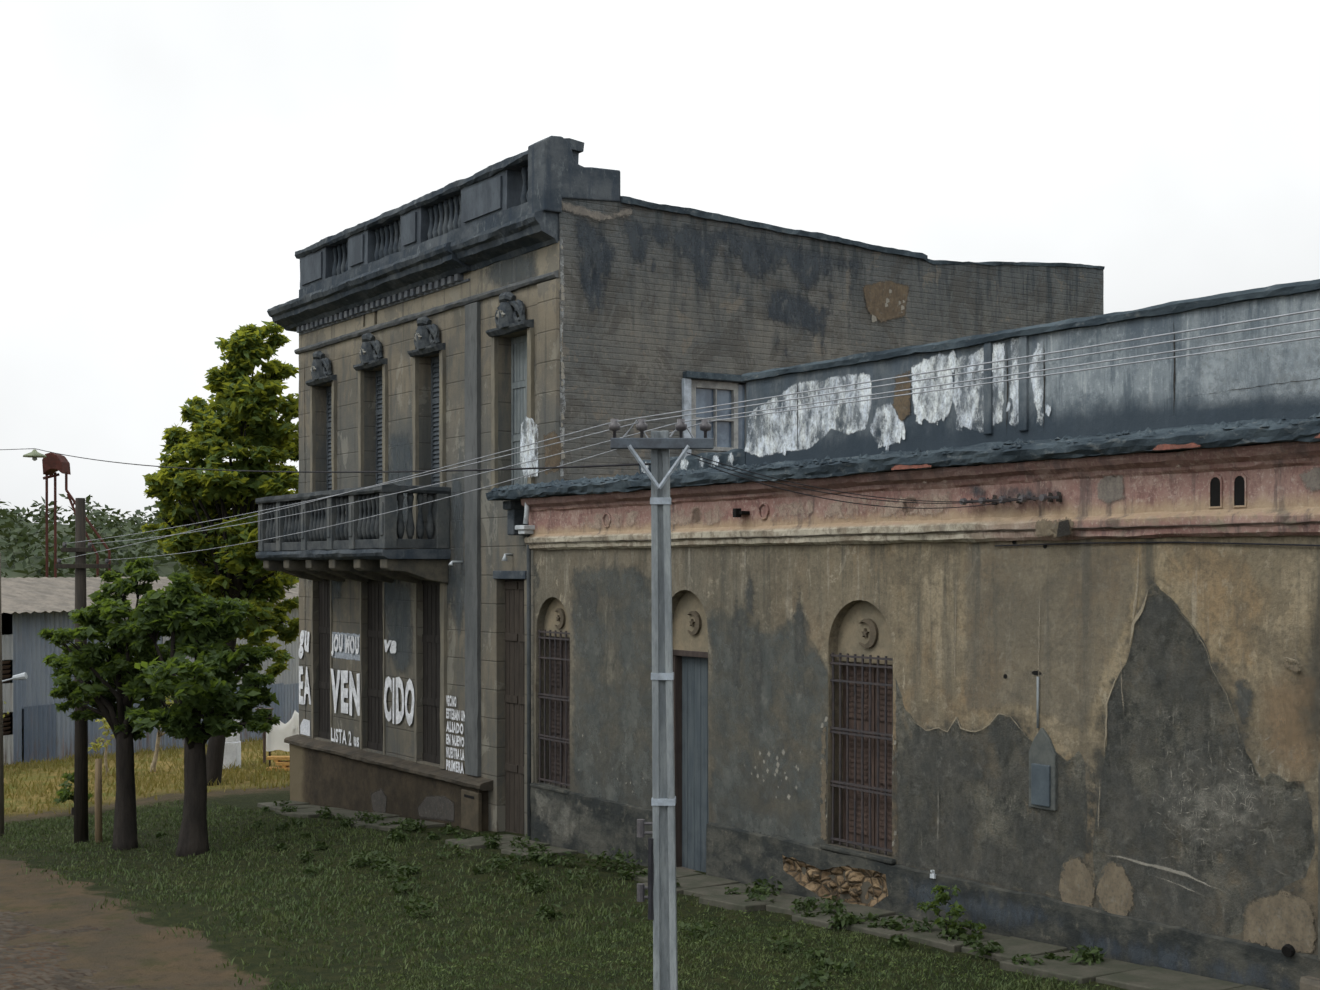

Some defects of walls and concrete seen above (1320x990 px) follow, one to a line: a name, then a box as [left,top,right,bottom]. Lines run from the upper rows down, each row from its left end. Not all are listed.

spalling [520,238,566,477]
damp [575,220,863,347]
peeling [680,338,1051,469]
flaking render [863,280,909,323]
damp [535,566,652,839]
damp [707,579,828,846]
flaking render [892,576,1318,937]